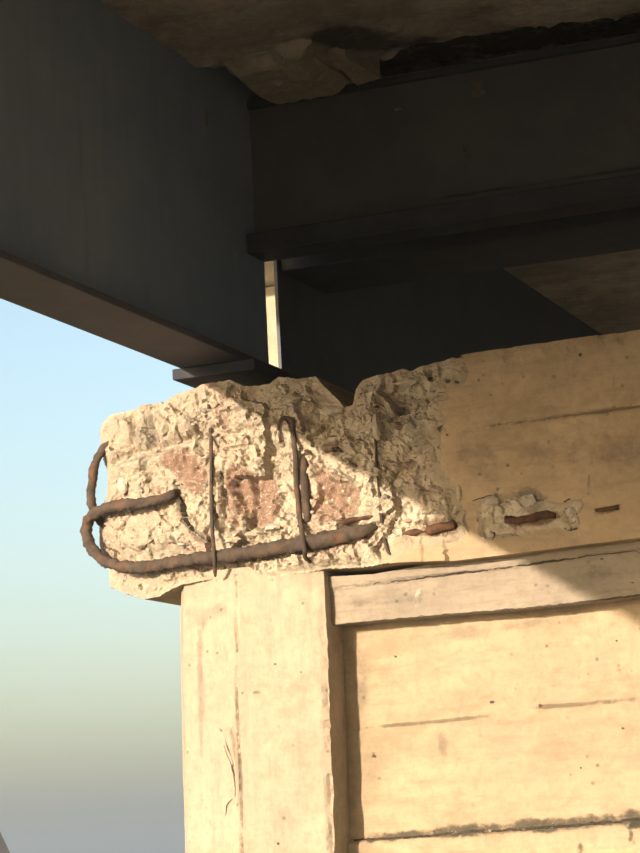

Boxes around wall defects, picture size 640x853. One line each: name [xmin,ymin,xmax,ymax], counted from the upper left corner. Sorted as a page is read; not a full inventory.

spalling [224,37,380,104]
corrosion [162,448,207,494]
corrosion [225,464,279,526]
spalling [80,357,584,604]
corrosion [317,467,360,521]
crack [354,817,640,841]